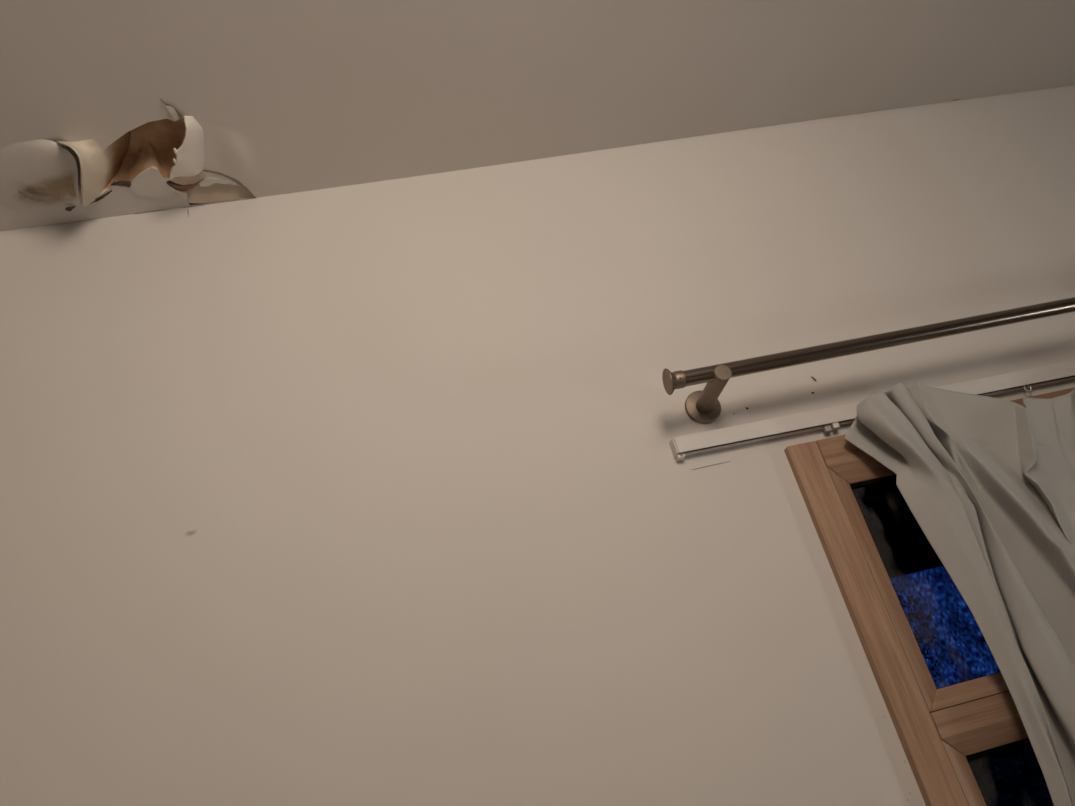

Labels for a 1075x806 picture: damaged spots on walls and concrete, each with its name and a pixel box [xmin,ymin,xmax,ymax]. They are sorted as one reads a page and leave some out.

spalling [105,106,253,203]